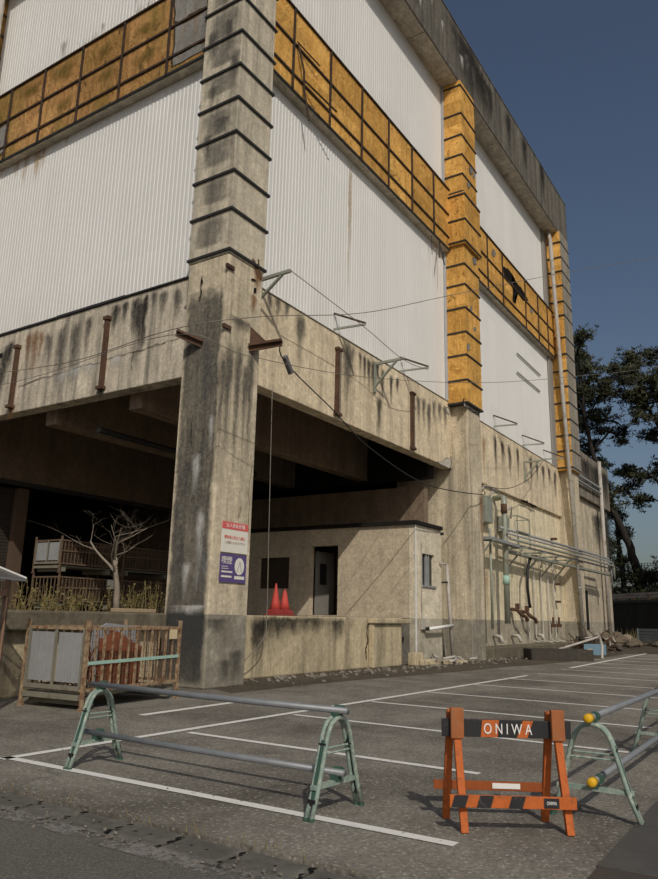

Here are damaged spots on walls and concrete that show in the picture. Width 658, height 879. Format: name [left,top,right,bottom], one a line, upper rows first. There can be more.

leakage [455,31,493,110]
leakage [113,290,180,342]
spalling [503,266,533,314]
leakage [0,343,13,386]
leakage [47,319,92,377]
leakage [345,345,399,391]
leakage [165,294,254,680]
leakage [253,618,319,644]